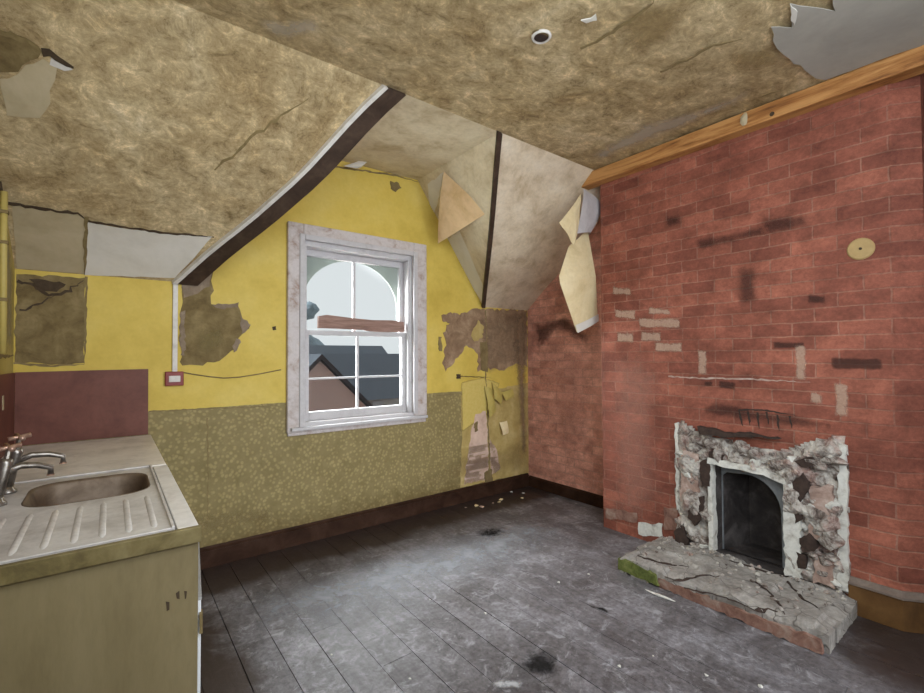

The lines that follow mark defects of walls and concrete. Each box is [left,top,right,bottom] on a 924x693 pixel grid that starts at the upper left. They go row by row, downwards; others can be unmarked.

crack [580,0,654,50]
peeling [0,58,73,118]
crack [214,99,308,170]
flaking render [13,274,88,367]
spalling [178,273,250,366]
peeling [438,308,528,485]
spalling [697,425,782,439]
flaking render [792,457,835,515]
crack [638,555,821,615]